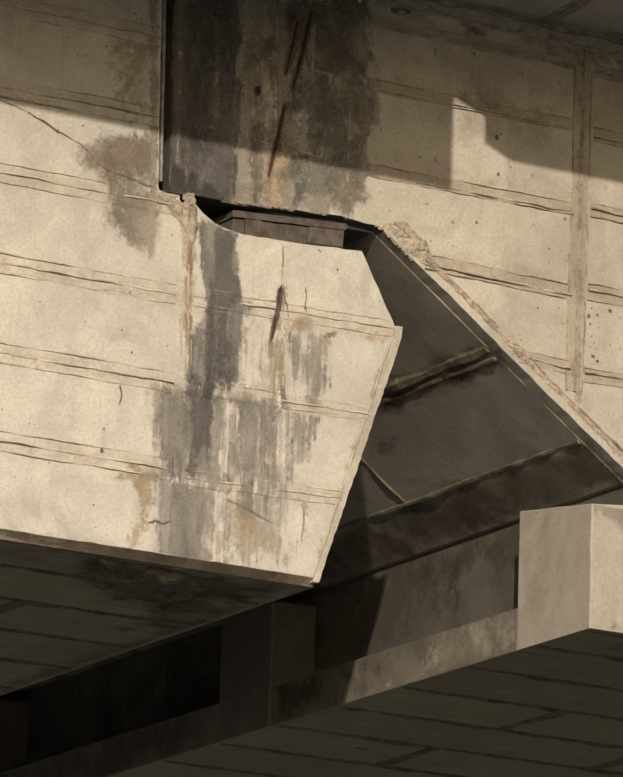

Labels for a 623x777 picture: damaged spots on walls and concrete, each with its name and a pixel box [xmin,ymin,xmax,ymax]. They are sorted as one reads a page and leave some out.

crack [0,97,158,188]
water stain [82,0,159,255]
water stain [169,0,381,216]
water stain [0,221,623,596]
spalling [375,221,623,461]
water stain [421,615,515,675]